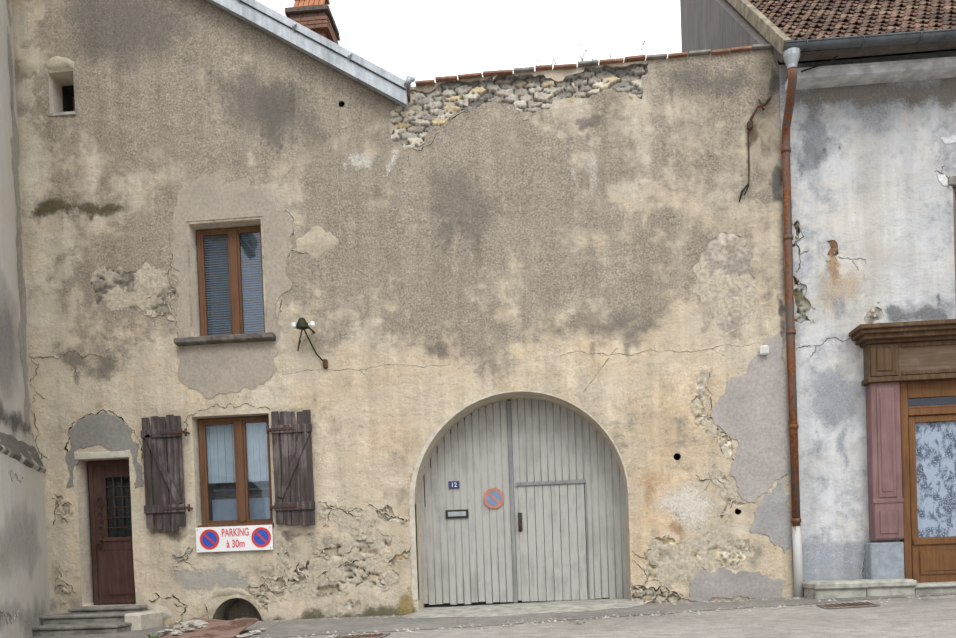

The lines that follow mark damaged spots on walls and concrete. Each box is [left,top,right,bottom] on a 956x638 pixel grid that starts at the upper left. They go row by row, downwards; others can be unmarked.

flaking render [390,64,648,150]
spalling [90,262,176,321]
spalling [793,276,816,323]
spalling [826,240,838,262]
corrosion [828,255,839,284]
crack [282,363,450,376]
spalling [690,370,733,458]
spalling [247,502,418,614]